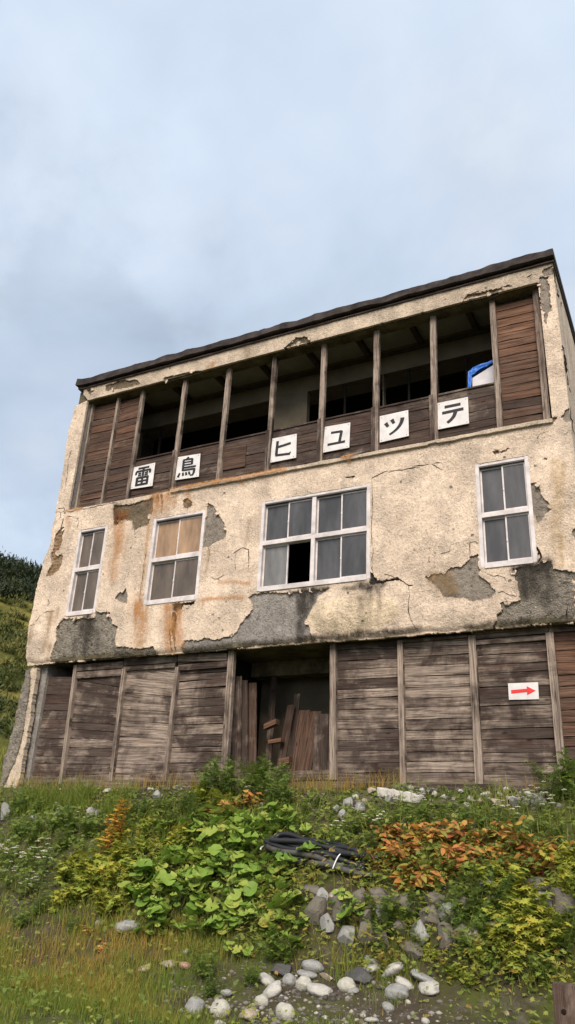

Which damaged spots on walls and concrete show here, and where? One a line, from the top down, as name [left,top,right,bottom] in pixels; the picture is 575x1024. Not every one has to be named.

peeling [537,266,554,324]
peeling [47,528,65,576]
peeling [112,498,153,530]
peeling [203,504,228,548]
crack [346,462,442,627]
peeling [531,483,552,522]
spalling [425,555,575,628]
spalling [51,612,157,663]
spalling [182,587,328,653]